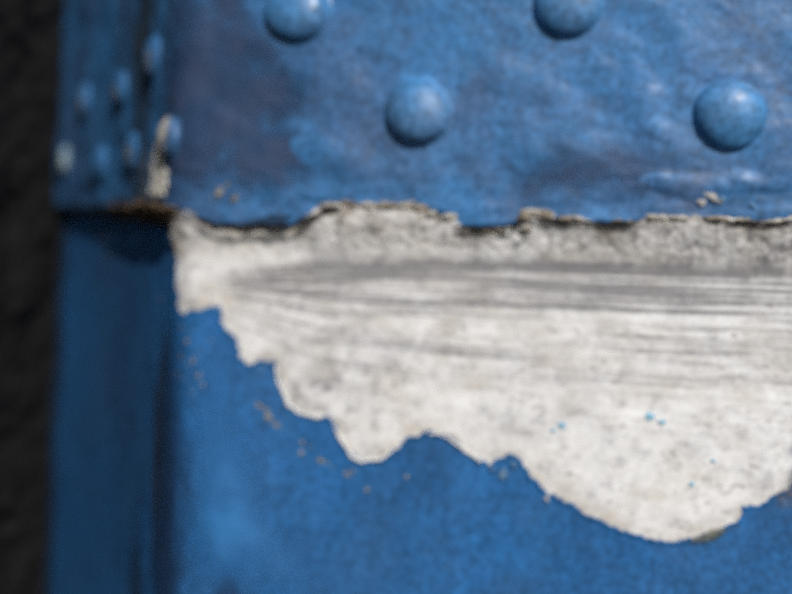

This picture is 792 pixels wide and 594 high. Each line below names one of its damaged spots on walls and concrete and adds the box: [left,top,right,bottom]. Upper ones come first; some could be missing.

peeling [148,115,169,200]
spalling [697,192,726,206]
peeling [169,200,792,548]